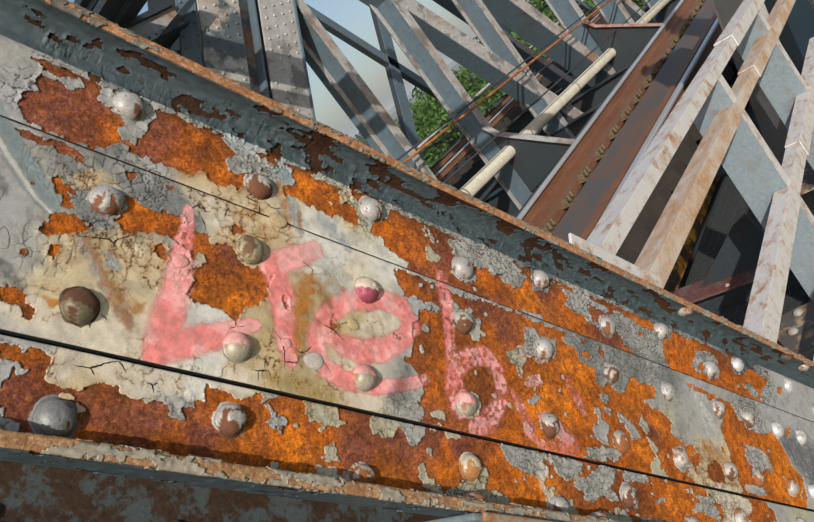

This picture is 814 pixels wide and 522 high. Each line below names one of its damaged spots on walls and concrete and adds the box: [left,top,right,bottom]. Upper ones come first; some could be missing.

peeling [24,6,103,49]
peeling [15,57,245,191]
peeling [80,14,703,314]
peeling [38,176,93,260]
rust [294,274,315,348]
crack [74,361,125,374]
peeling [0,196,814,522]